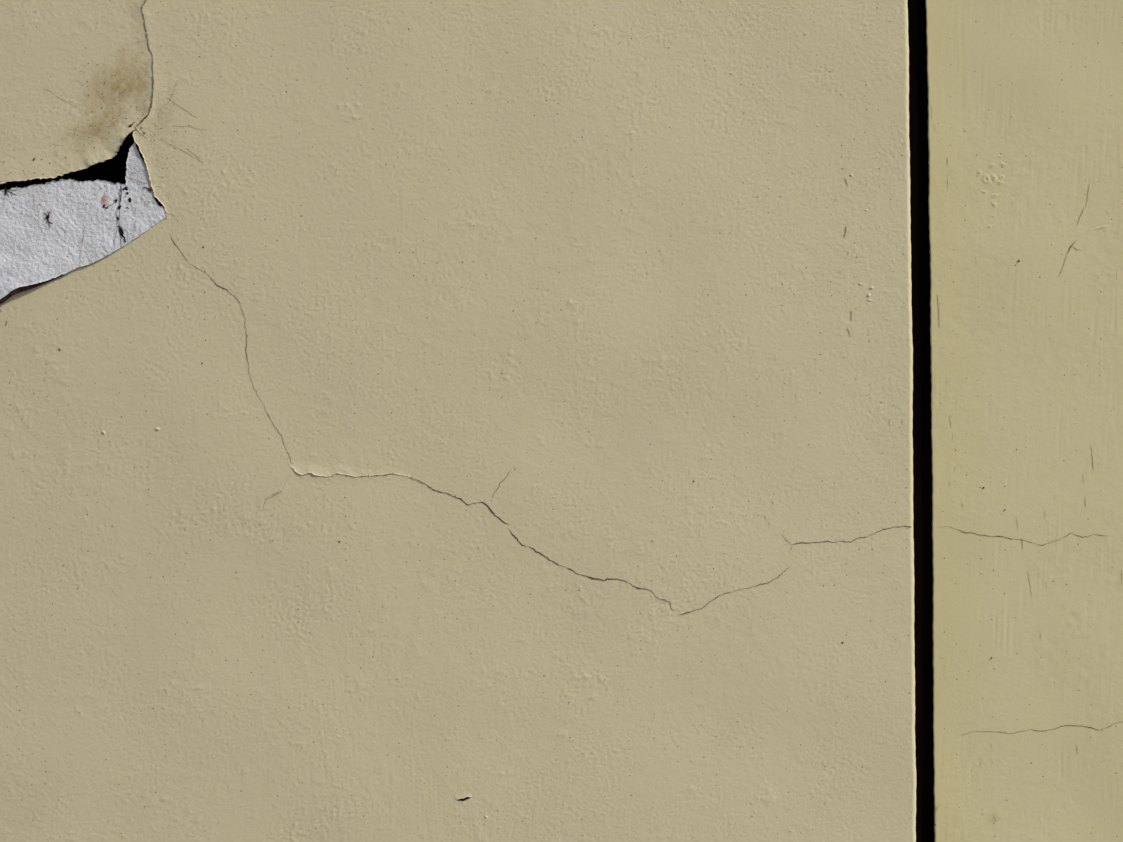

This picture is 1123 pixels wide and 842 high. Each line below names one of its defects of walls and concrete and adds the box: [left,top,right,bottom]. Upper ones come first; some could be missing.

crack [114,0,168,141]
peeling [0,94,179,304]
crack [171,238,910,615]
crack [949,482,1108,548]